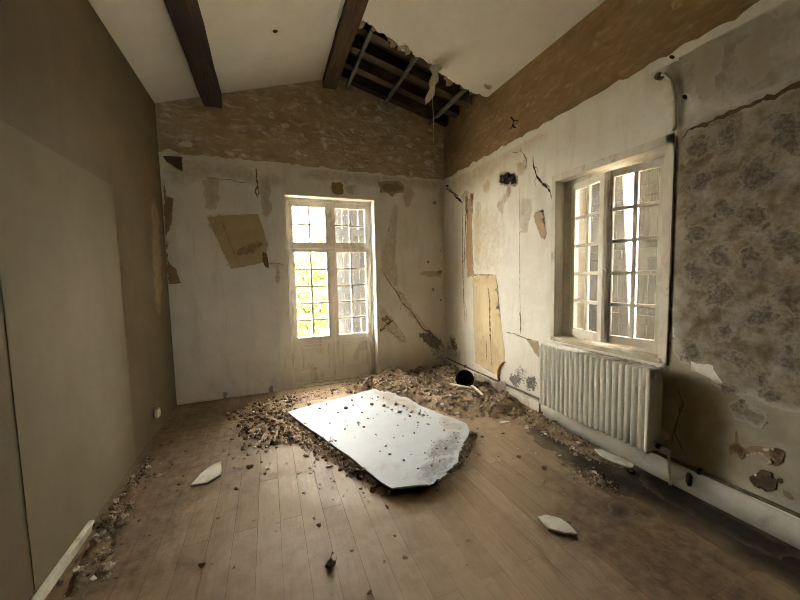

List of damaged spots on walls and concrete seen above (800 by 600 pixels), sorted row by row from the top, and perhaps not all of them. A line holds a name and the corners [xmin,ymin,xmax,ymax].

peeling [163,155,183,172]
crack [513,148,552,199]
peeling [161,180,182,284]
peeling [207,213,269,269]
peeling [378,181,405,288]
peeling [518,196,548,240]
leakage [645,0,800,513]
crack [383,272,446,349]
leakage [418,332,461,364]
leakage [475,332,538,391]
peeling [729,431,794,500]
leakage [526,428,800,594]